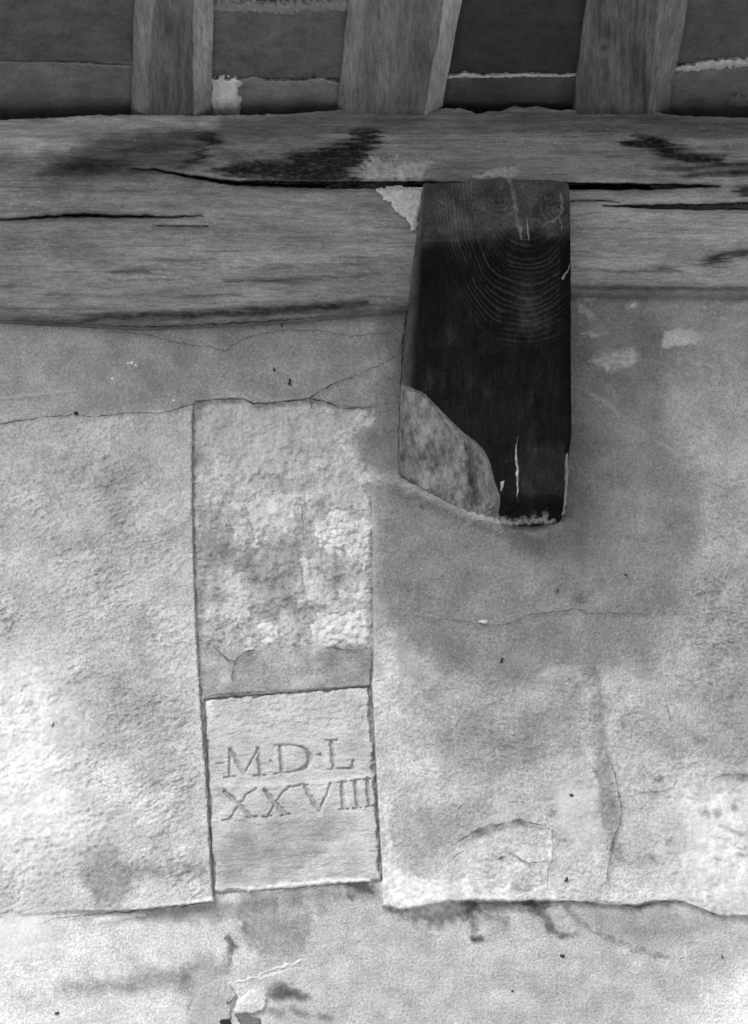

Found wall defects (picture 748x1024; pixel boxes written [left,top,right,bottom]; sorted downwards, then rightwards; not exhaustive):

damp [214,130,383,181]
peeling [661,328,702,349]
crack [0,293,417,471]
crack [433,609,650,626]
spalling [185,978,268,1024]